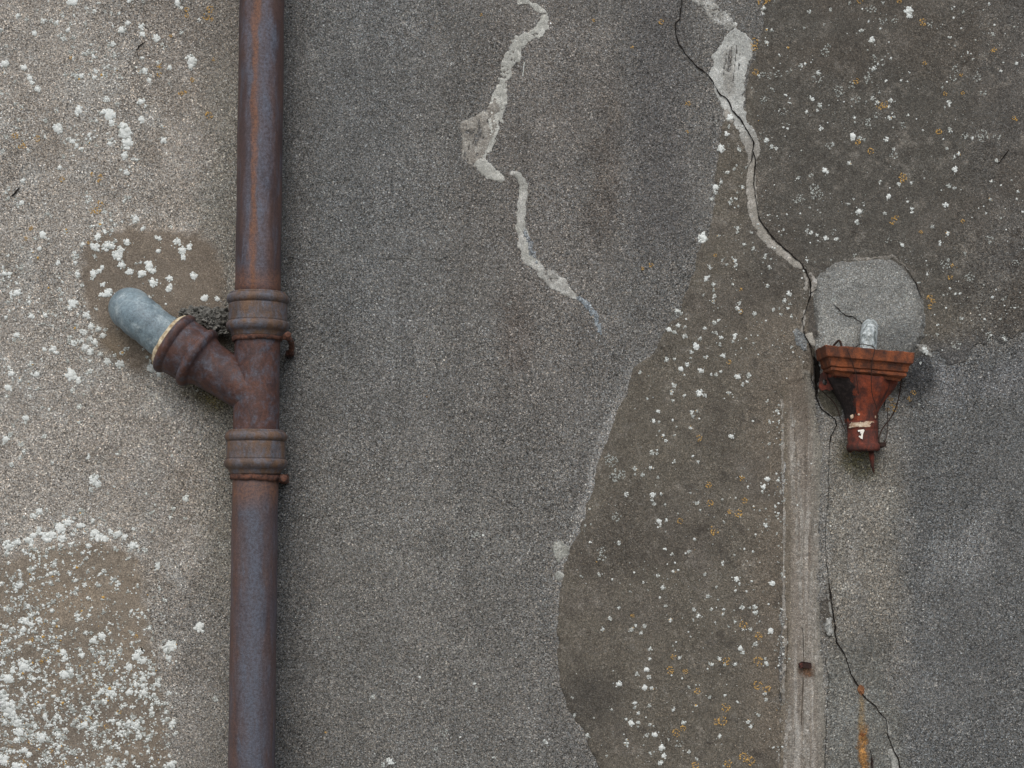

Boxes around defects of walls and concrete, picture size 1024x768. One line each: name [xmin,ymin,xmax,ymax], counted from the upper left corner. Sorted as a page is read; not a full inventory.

crack [460,0,602,335]
spalling [793,328,815,351]
crack [675,0,901,768]
spalling [552,540,570,581]
spalling [823,594,837,637]
rust [857,699,873,768]